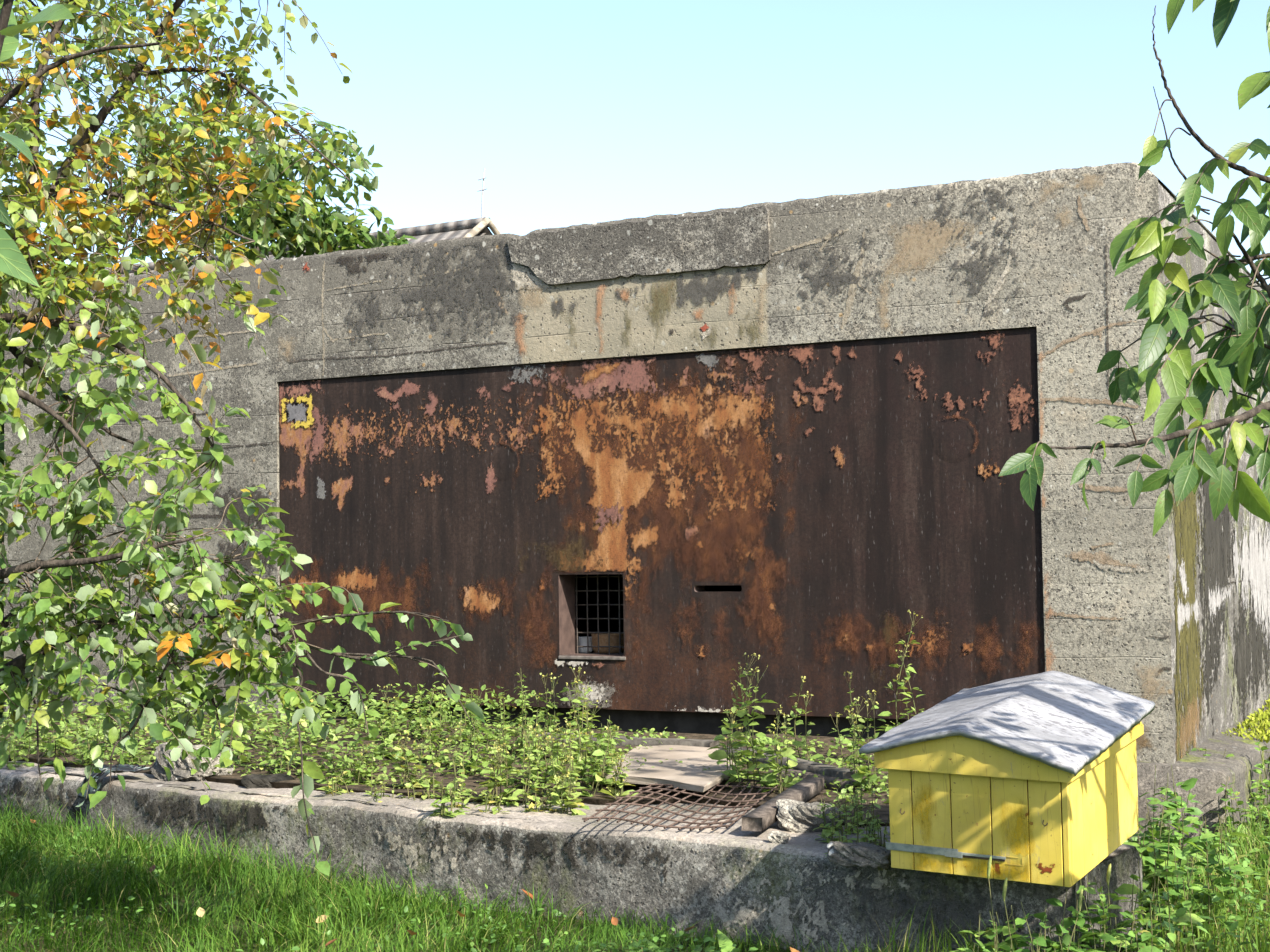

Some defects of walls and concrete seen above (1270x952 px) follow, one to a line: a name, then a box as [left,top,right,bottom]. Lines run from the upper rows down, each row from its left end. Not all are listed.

damp [341,239,535,361]
spalling [511,262,549,290]
rust [282,366,794,664]
rust [816,614,1052,671]
damp [1171,479,1270,761]
damp [425,822,685,882]